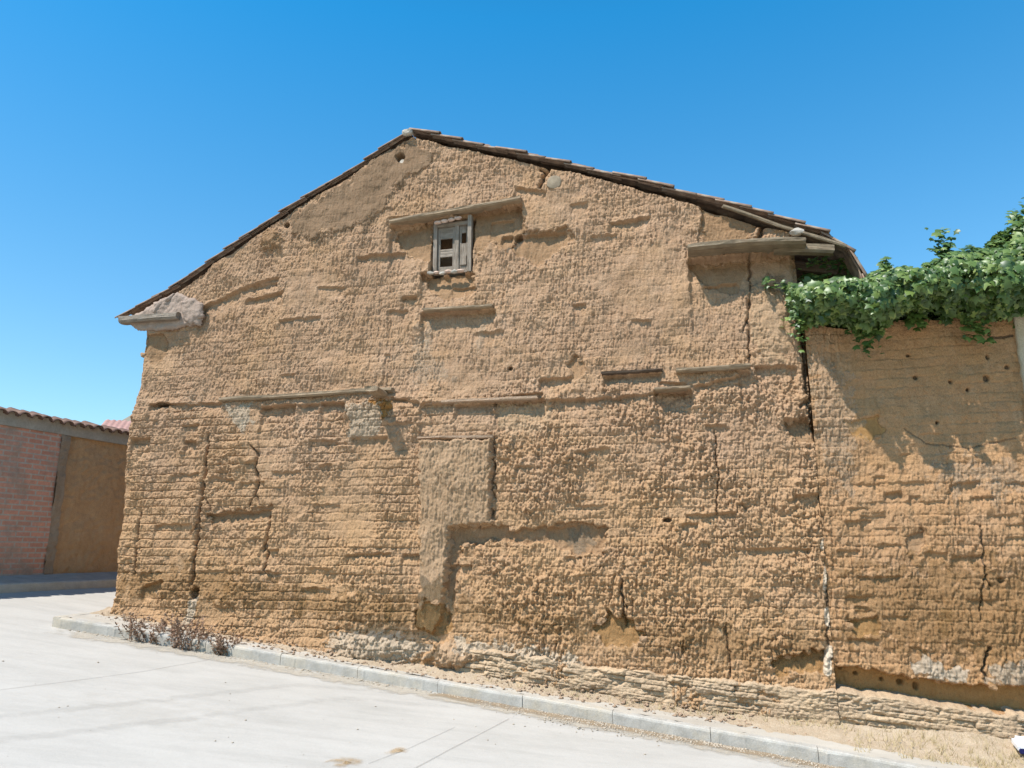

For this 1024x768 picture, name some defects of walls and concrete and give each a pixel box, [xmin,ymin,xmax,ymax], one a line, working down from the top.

crack [743,227,763,363]
crack [799,334,811,425]
crack [191,435,212,587]
crack [249,446,271,573]
crack [713,433,725,515]
spalling [415,522,609,643]
spalling [593,610,648,647]
crack [820,539,833,676]
spalling [771,648,1024,711]
crack [978,526,991,620]
crack [980,646,991,683]